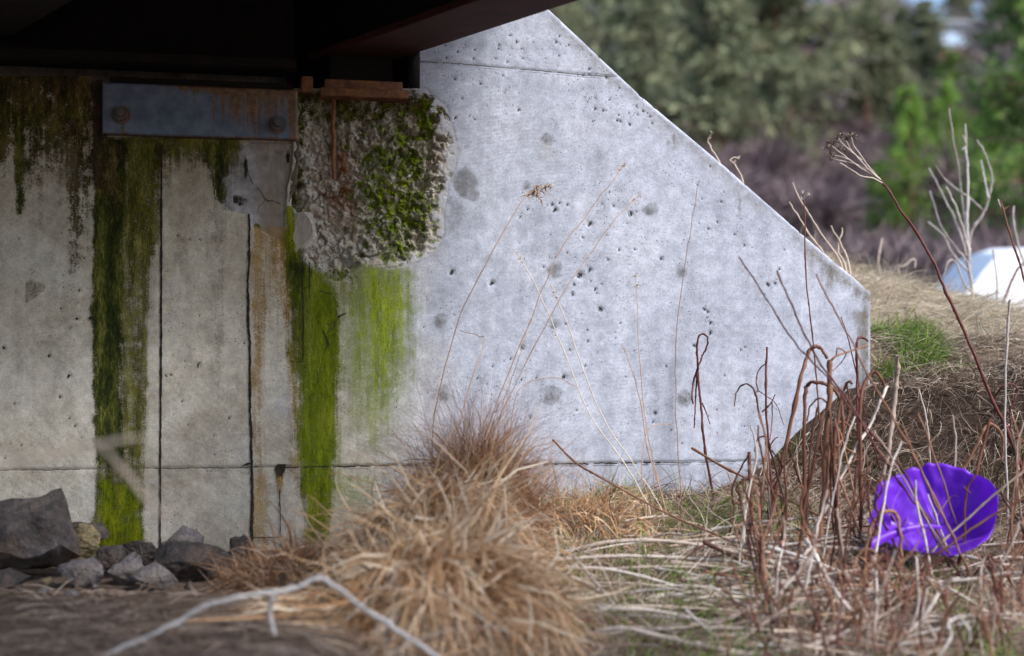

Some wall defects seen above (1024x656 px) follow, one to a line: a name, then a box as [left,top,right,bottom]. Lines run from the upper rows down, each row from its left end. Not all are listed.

water stain [13,107,26,214]
water stain [60,80,172,555]
crack [0,145,428,546]
spalling [212,75,466,292]
water stain [275,211,414,545]